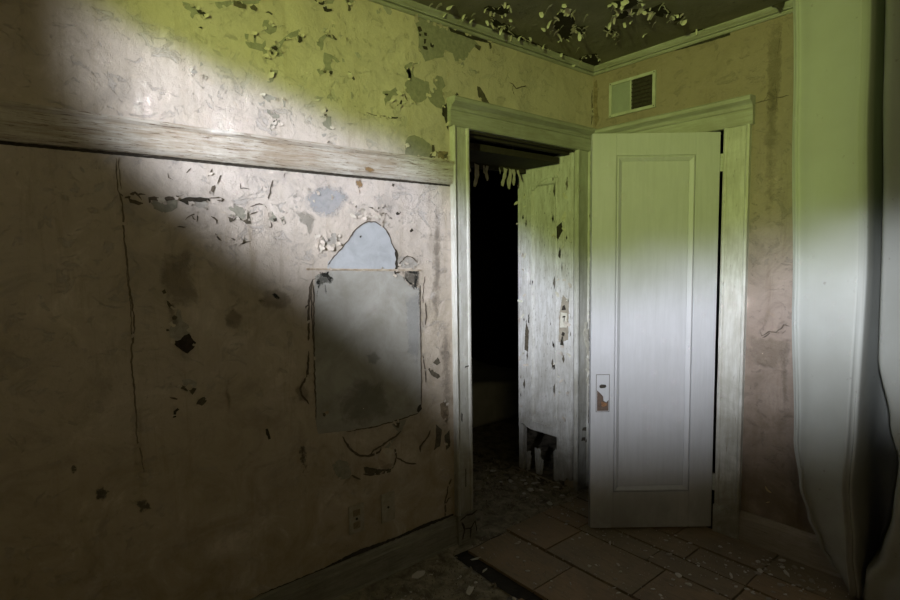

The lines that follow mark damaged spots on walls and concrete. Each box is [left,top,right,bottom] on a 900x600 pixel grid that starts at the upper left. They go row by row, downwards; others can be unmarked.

peeling [182,2,209,29]
peeling [215,0,305,83]
peeling [316,28,361,80]
peeling [383,2,601,131]
peeling [603,0,705,44]
peeling [258,93,288,131]
peeling [404,135,451,160]
peeling [188,197,252,224]
peeling [268,193,298,228]
crack [116,159,287,469]
flaking render [314,204,440,434]
crack [342,278,431,480]